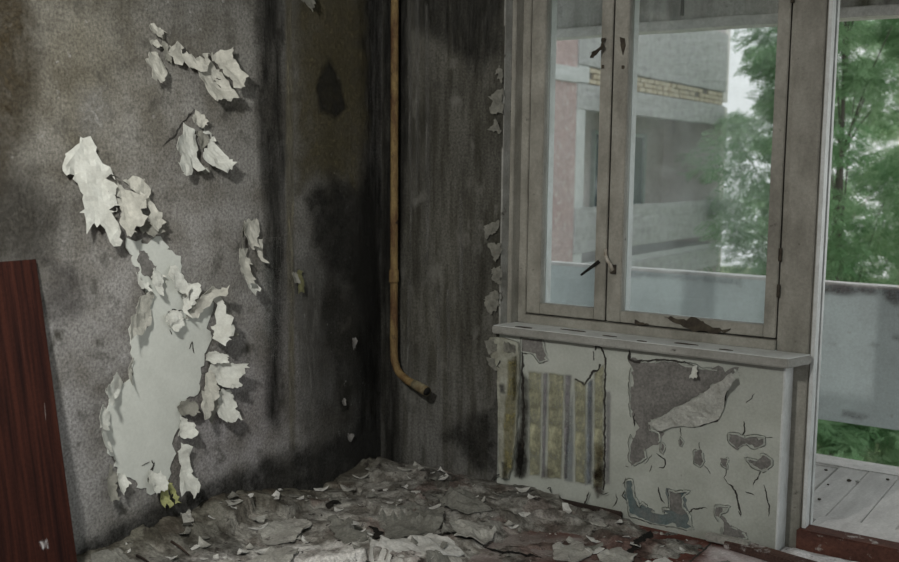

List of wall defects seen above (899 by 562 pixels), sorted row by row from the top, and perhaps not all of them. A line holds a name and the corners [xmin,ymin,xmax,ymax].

leakage [0,0,32,136]
peeling [145,23,249,101]
peeling [163,110,237,176]
peeling [239,218,269,296]
leakage [80,0,500,555]
peeling [62,136,249,508]
spalling [485,326,549,480]
spalling [627,350,739,467]
spalling [693,442,710,473]
spalling [720,422,774,484]
spalling [624,478,695,531]
spalling [714,504,748,540]